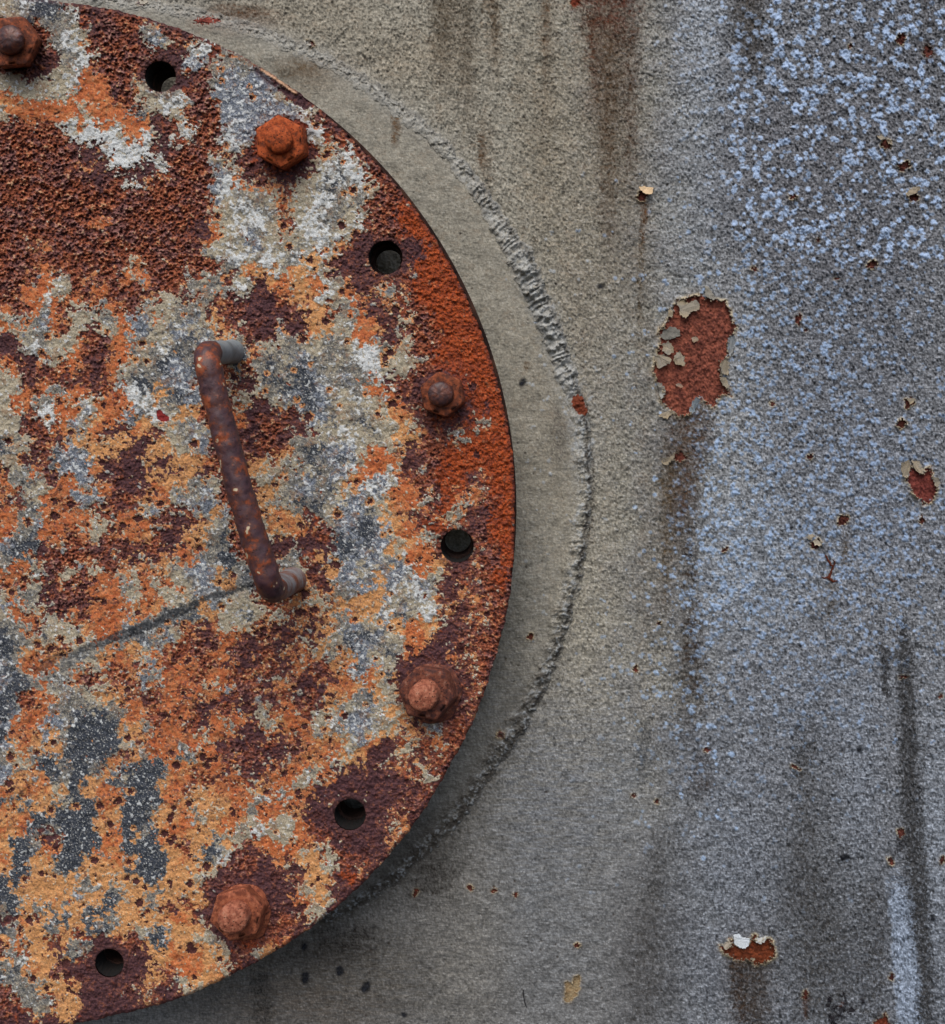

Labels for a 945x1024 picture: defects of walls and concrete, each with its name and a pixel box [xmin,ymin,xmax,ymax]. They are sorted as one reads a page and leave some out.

corrosion [0,98,222,315]
peeling [636,186,653,201]
corrosion [231,278,309,343]
peeling [654,286,736,419]
corrosion [238,395,302,468]
corrosion [324,165,515,741]
peeling [900,460,941,524]
corrosion [33,527,150,630]
corrosion [301,761,415,895]
corrosion [60,934,153,1024]
corrosion [180,838,303,976]
peeling [720,934,775,966]